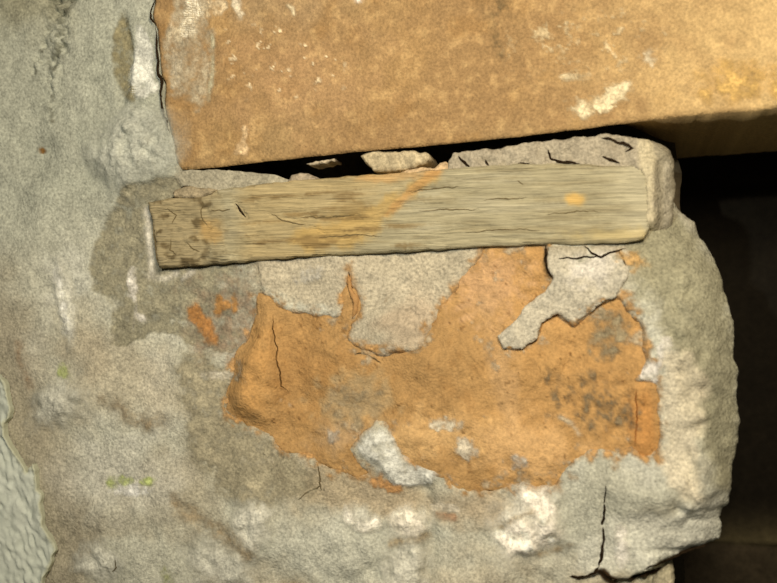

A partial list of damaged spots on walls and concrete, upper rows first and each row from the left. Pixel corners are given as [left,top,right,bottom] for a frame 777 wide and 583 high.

crack [558,247,626,266]
spalling [188,295,237,343]
spalling [222,244,663,496]
crack [570,485,606,579]